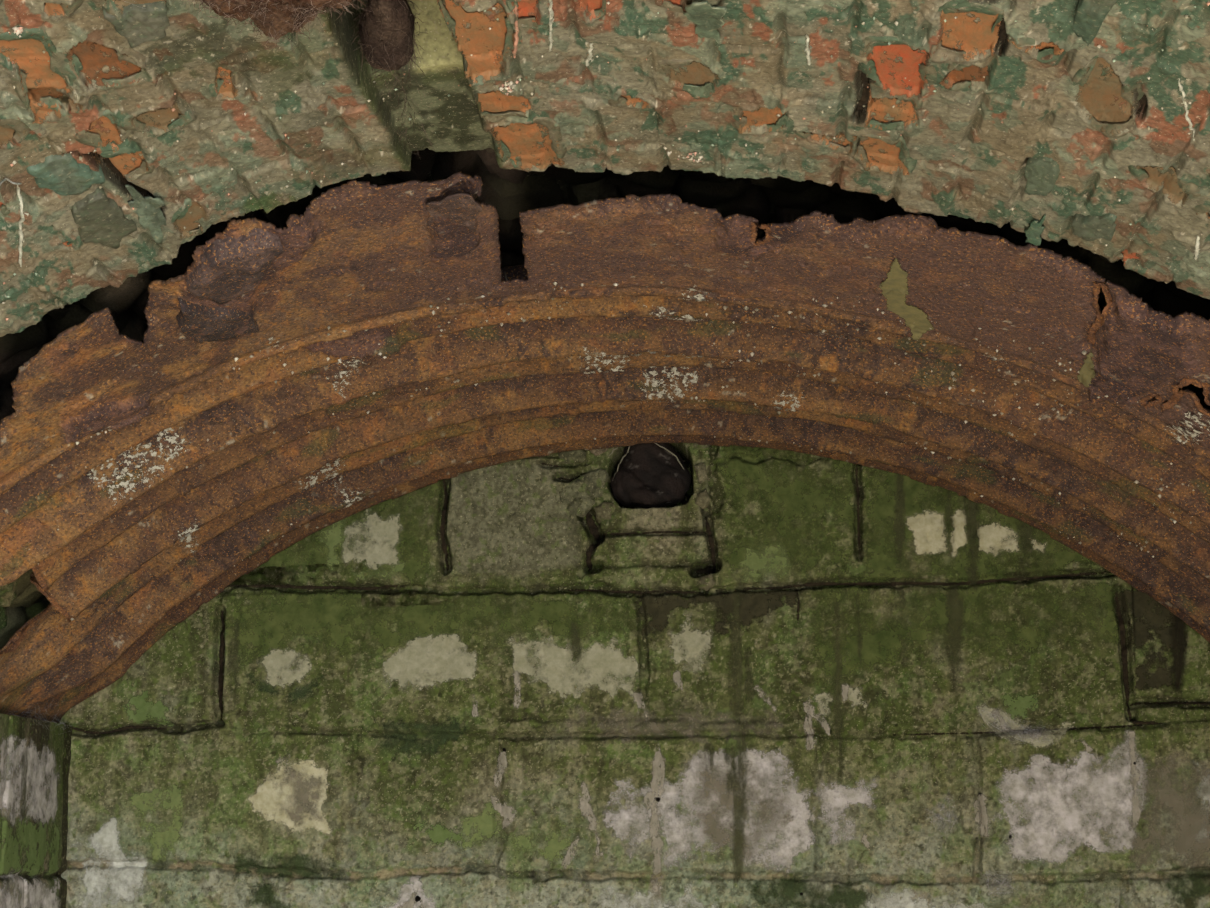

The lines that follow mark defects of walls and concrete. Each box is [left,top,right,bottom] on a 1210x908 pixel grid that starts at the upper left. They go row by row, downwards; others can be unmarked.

flaking render [0,0,195,182]
flaking render [437,0,567,170]
flaking render [733,0,1065,176]
flaking render [1071,55,1144,138]
crack [1136,94,1147,117]
crack [91,152,155,198]
crack [440,479,449,571]
leakage [382,634,477,691]
leakage [248,757,331,834]
leakage [508,583,877,908]
leakage [973,705,1210,867]
leakage [79,818,147,908]